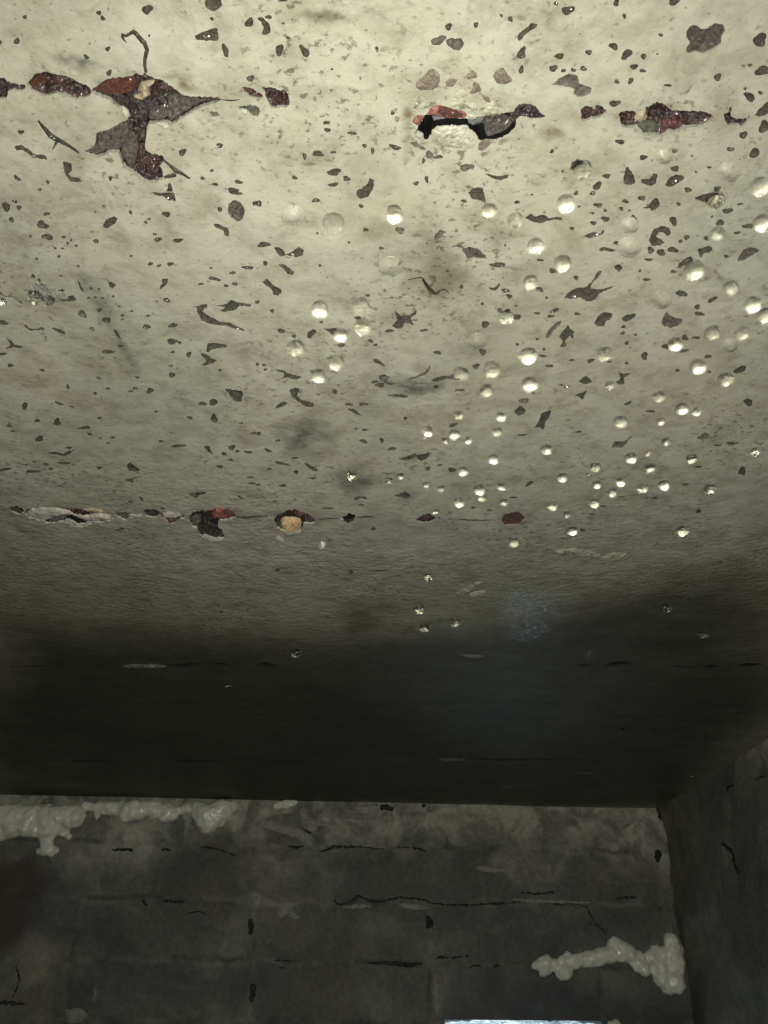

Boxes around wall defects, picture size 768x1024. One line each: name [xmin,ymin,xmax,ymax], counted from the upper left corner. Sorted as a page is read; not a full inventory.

peeling [412,67,512,136]
spalling [619,92,768,136]
spalling [0,72,222,201]
peeling [25,506,143,528]
spalling [160,507,236,543]
spalling [274,509,317,544]
rust [501,512,526,525]
crack [334,895,520,910]